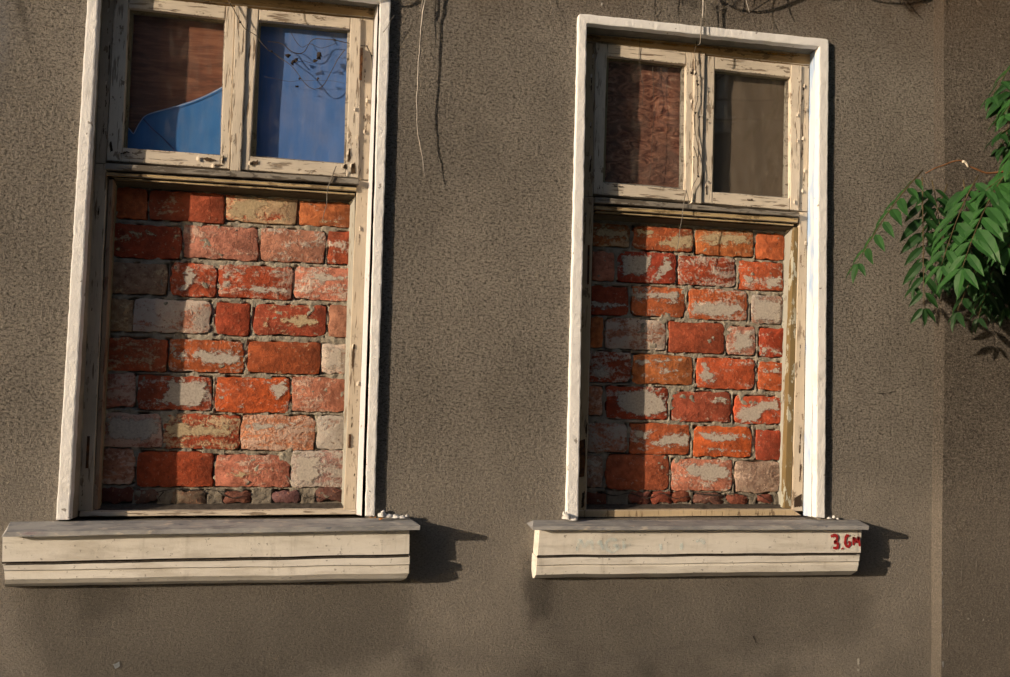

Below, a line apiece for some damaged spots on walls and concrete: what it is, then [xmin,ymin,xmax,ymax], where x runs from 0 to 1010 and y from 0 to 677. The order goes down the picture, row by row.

peeling [341,107,366,174]